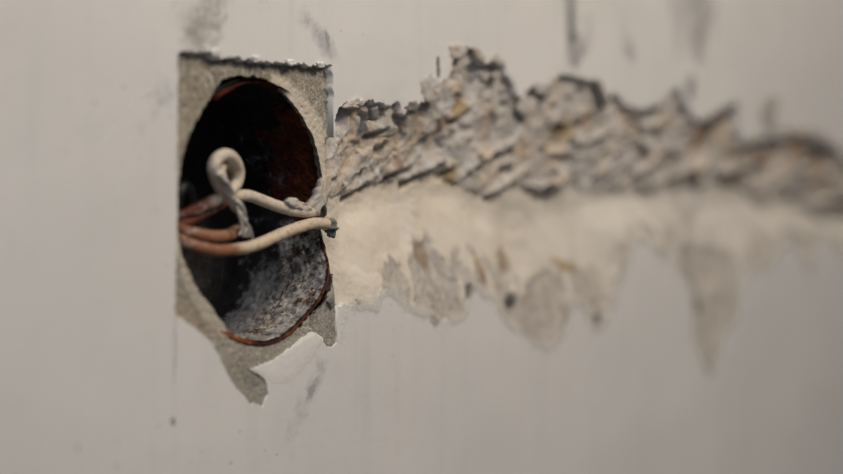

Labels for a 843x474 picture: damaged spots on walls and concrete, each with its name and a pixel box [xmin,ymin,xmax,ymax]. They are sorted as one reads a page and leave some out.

corrosion [210,81,320,203]
spalling [177,44,843,218]
spalling [175,230,338,406]
corrosion [220,248,330,346]
spalling [377,232,474,325]
spalling [495,262,602,346]
spalling [679,242,743,365]